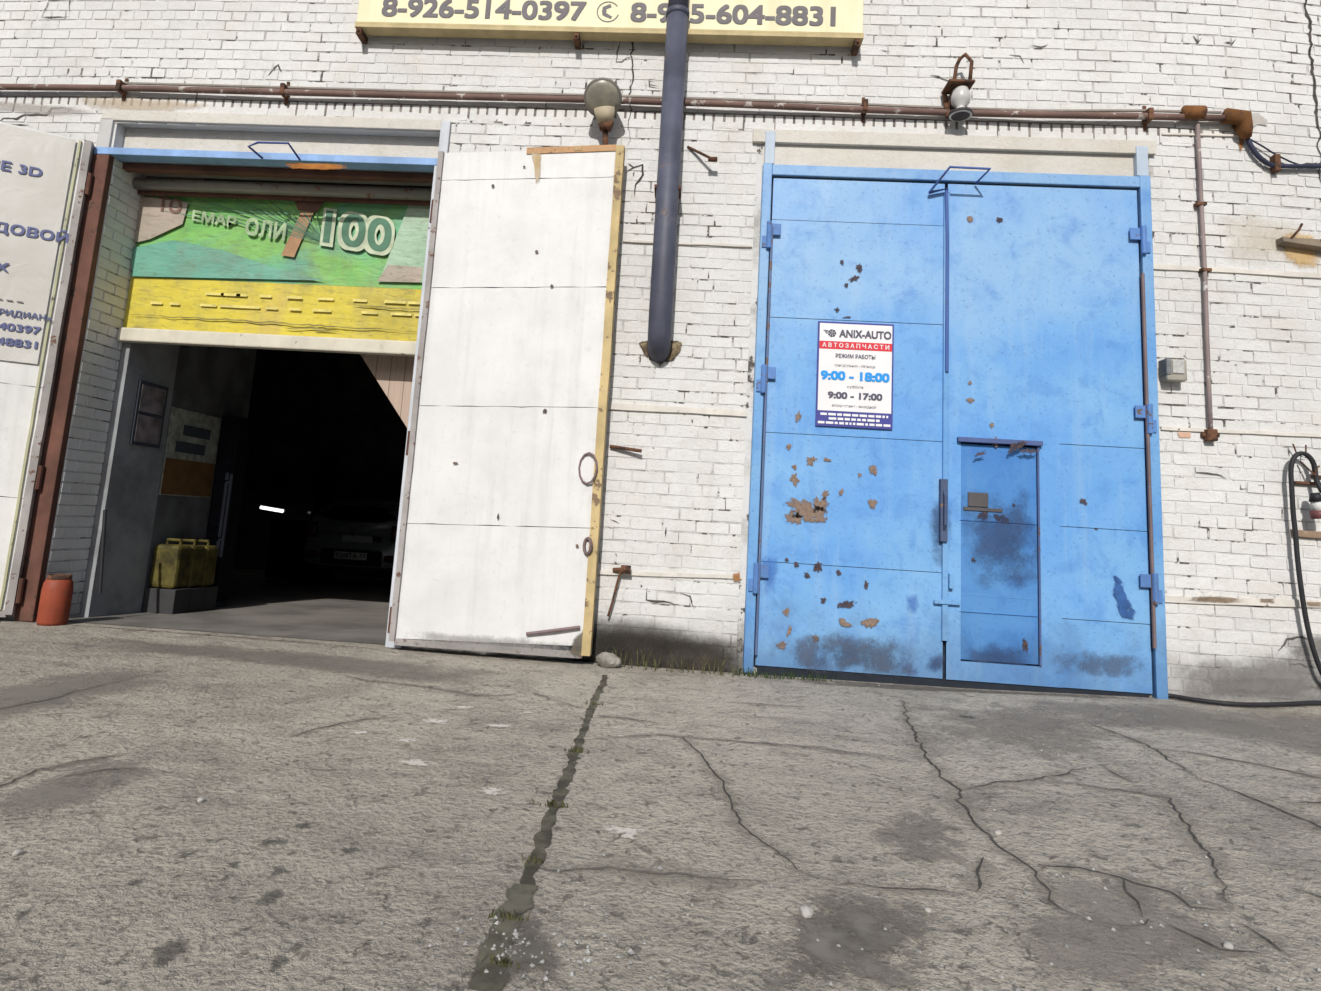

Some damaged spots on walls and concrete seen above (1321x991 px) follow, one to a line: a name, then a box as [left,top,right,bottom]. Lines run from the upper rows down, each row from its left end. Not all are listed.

crack [1304,0,1321,181]
leakage [582,638,730,672]
crack [1278,636,1308,666]